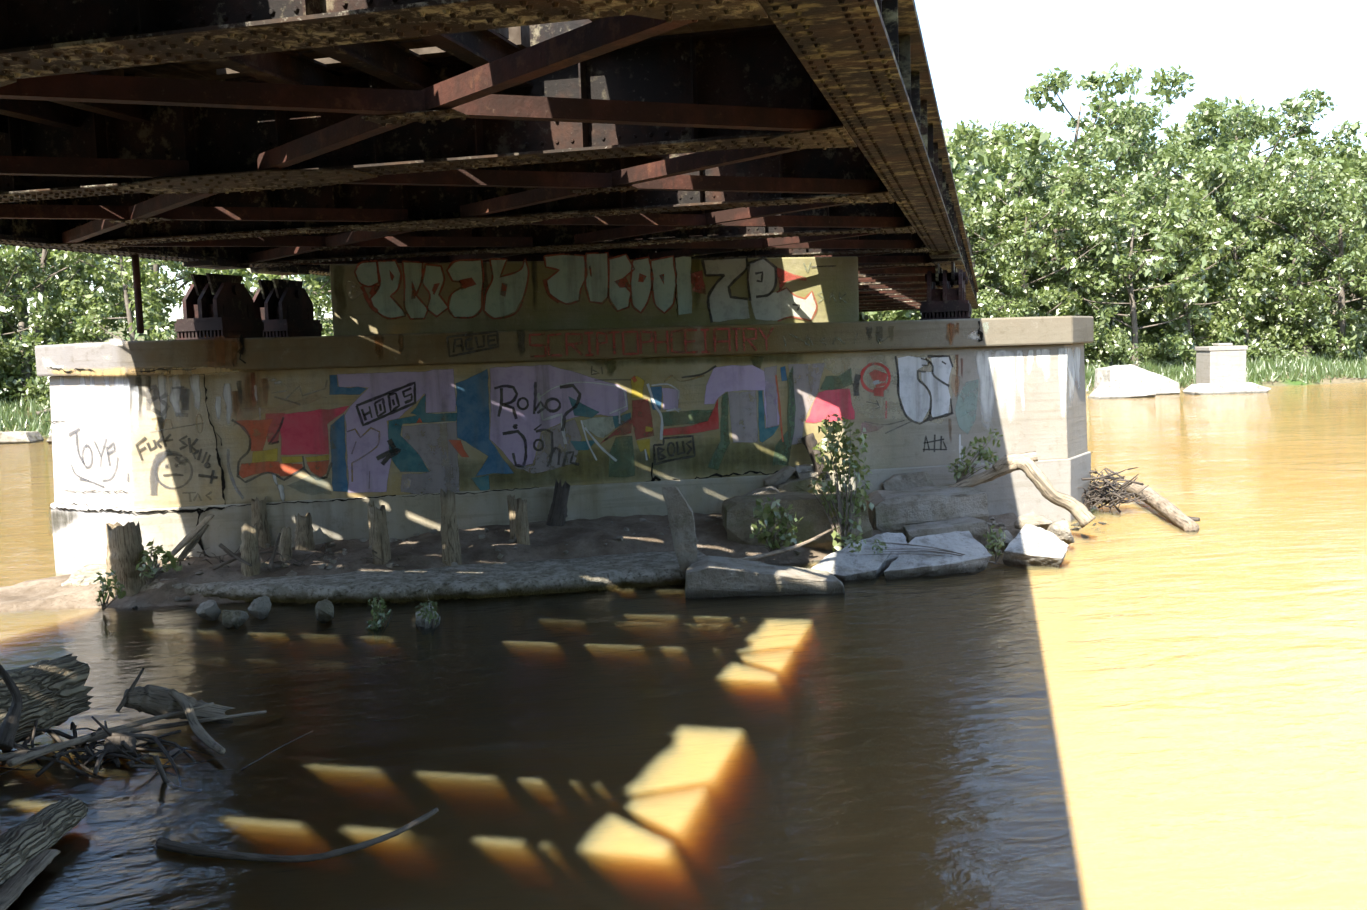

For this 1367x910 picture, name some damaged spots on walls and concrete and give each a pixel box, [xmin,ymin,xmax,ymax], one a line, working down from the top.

crack [49,335,539,556]
water stain [976,347,1081,420]